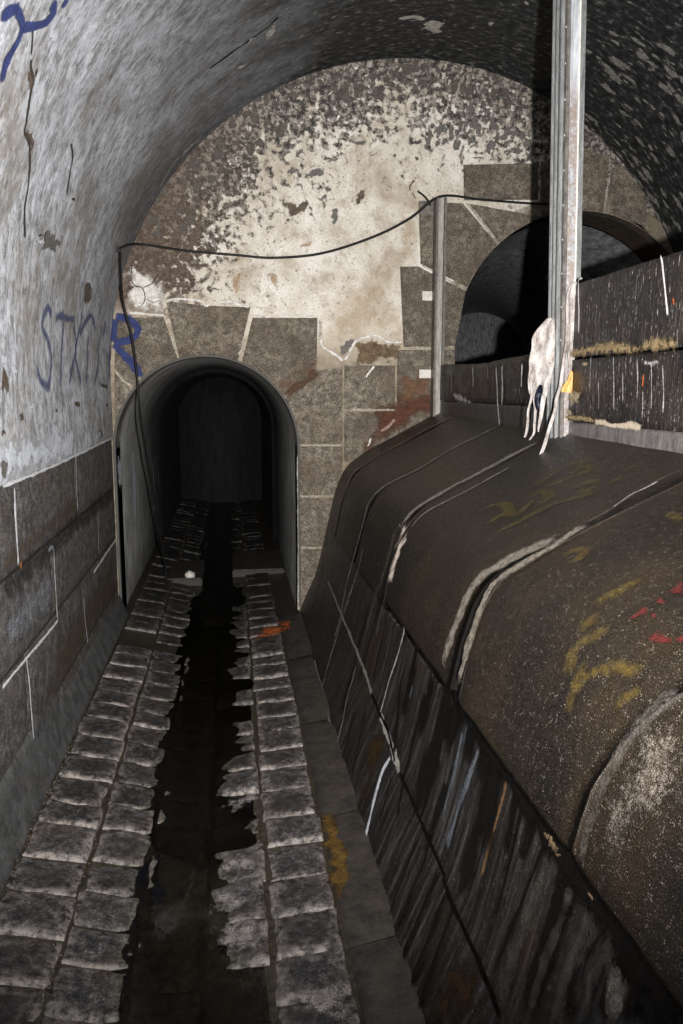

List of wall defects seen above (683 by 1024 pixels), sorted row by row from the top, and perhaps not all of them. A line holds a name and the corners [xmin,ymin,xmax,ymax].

crack [209,17,279,69]
flaking render [134,60,536,365]
corrosion [287,370,318,396]
corrosion [366,376,430,450]